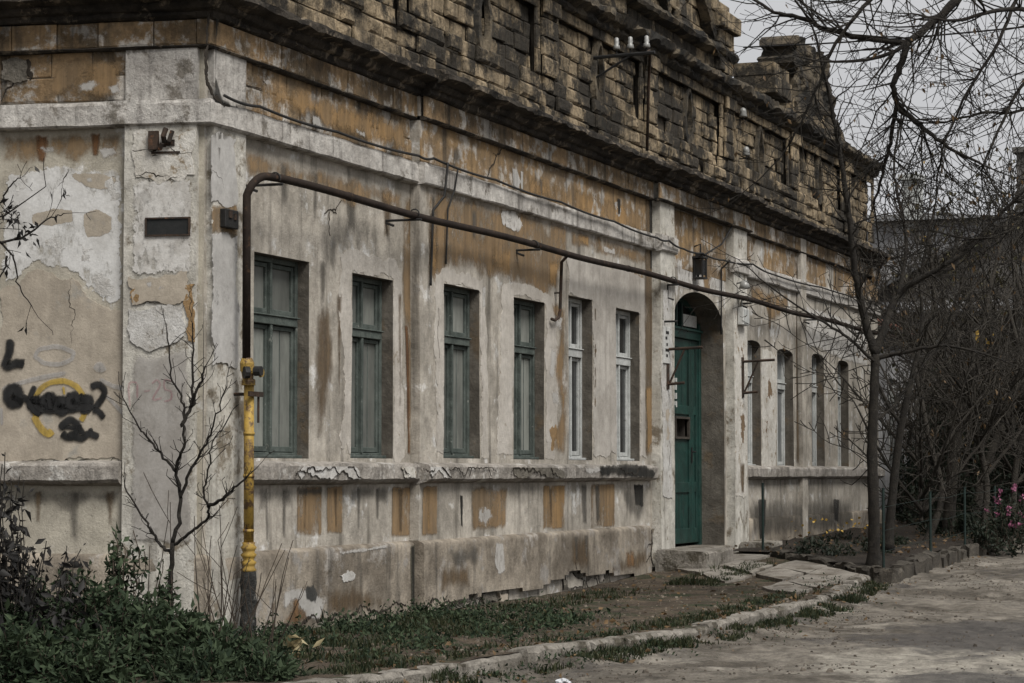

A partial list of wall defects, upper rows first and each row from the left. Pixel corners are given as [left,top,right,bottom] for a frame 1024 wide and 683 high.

spalling [1,58,33,101]
peeling [51,61,122,96]
damp [513,169,523,189]
peeling [429,190,646,306]
damp [248,155,411,452]
peeling [2,129,196,541]
damp [586,249,655,515]
peeling [460,487,507,529]
flaking render [341,570,355,582]
damp [442,550,476,589]
damp [495,544,505,574]
damp [573,536,588,566]